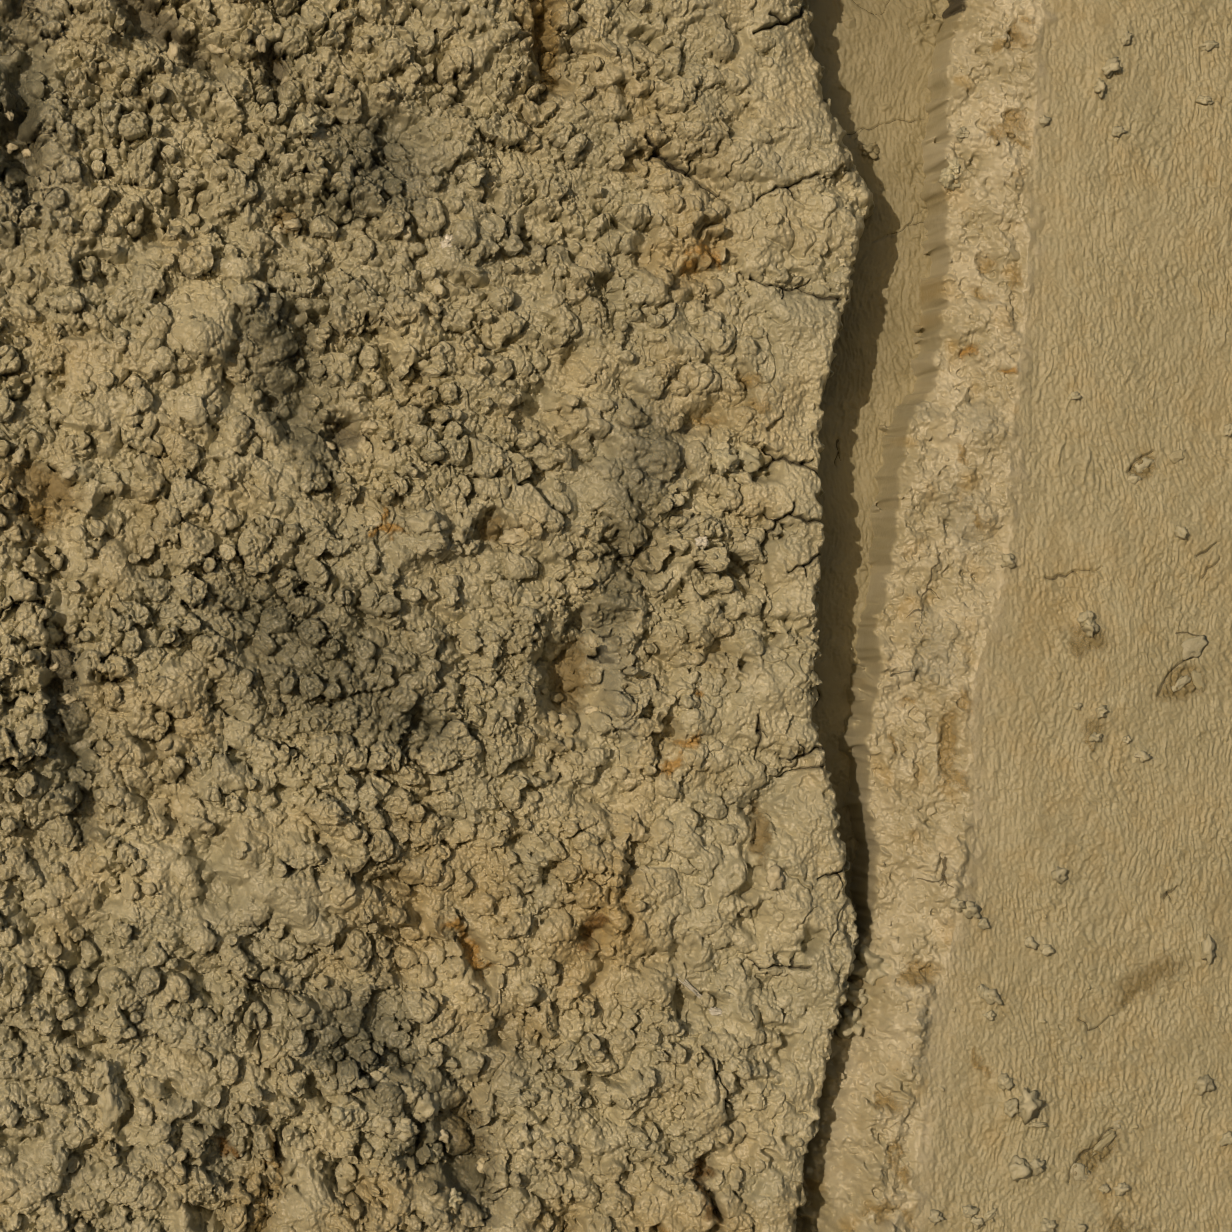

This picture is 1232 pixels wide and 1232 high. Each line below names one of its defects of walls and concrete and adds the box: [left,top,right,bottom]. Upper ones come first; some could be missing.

crack [753,7,803,34]
rust [534,0,558,84]
crack [645,135,716,197]
crack [758,173,820,199]
crack [749,277,841,301]
crack [761,439,840,477]
crack [760,503,820,545]
spalling [796,0,1045,1232]
crack [754,715,823,777]
rust [579,914,607,951]
crack [749,955,811,969]
crack [701,1046,731,1113]